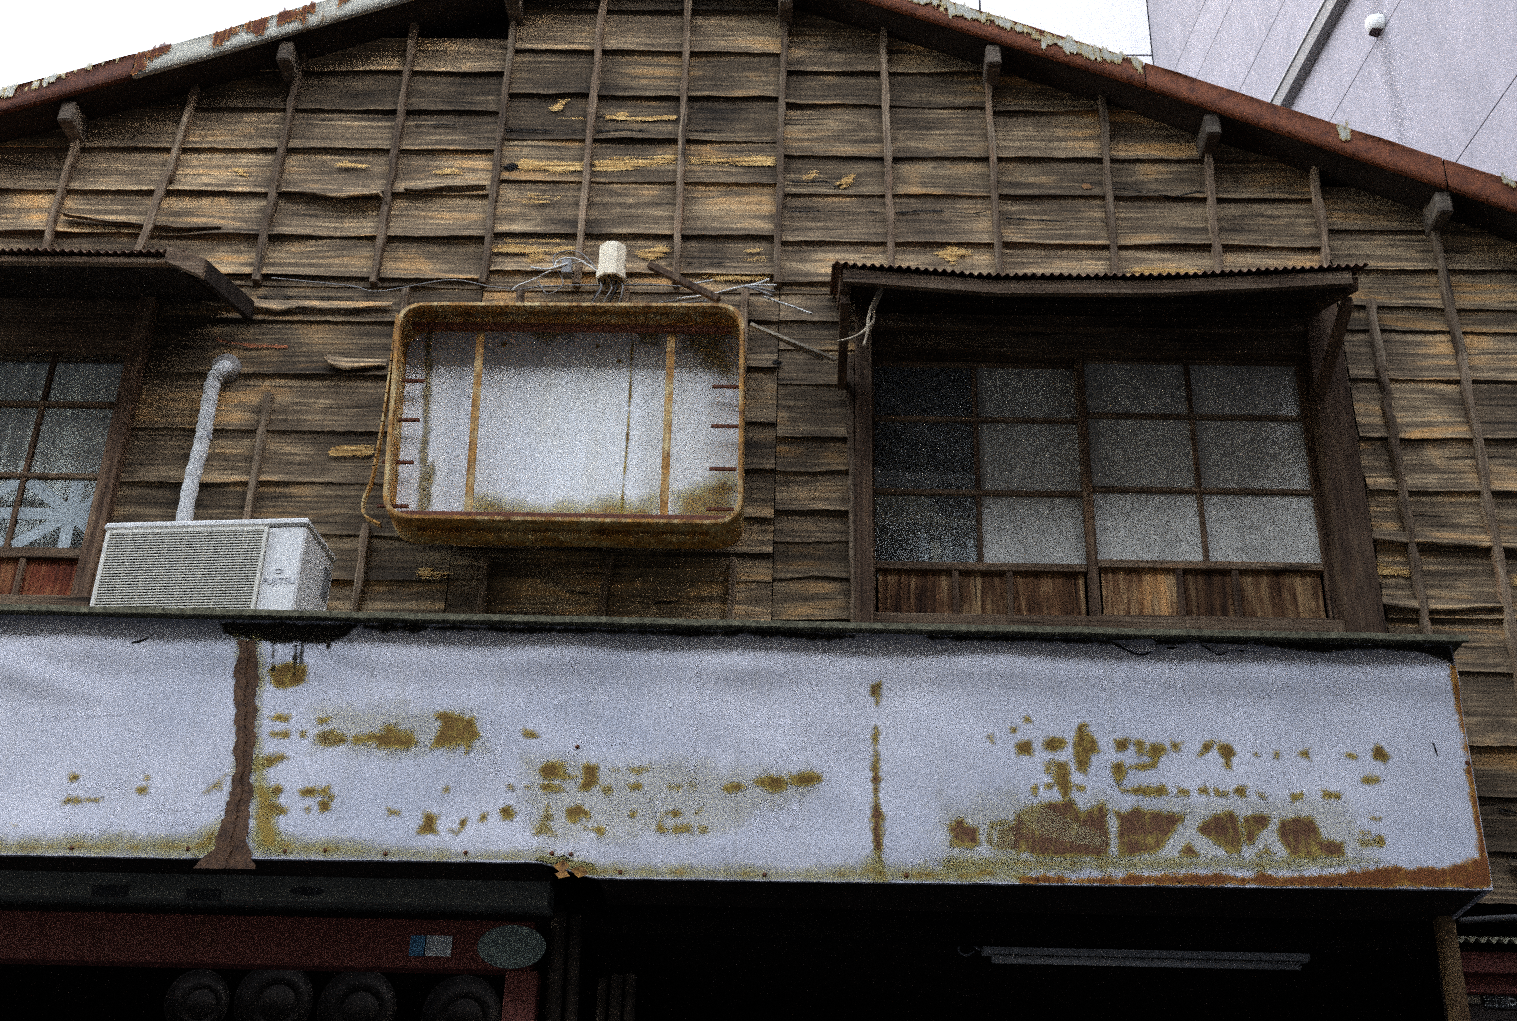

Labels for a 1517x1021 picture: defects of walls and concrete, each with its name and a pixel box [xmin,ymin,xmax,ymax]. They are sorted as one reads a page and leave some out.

peeling [0,57,120,97]
rust [131,42,171,76]
rust [209,0,316,47]
peeling [911,0,1143,74]
rust [685,334,731,377]
rust [418,331,434,511]
rust [475,332,659,514]
rust [679,476,734,517]
rust [258,661,307,689]
rust [235,711,480,860]
rust [417,761,648,835]
rust [478,665,1491,888]